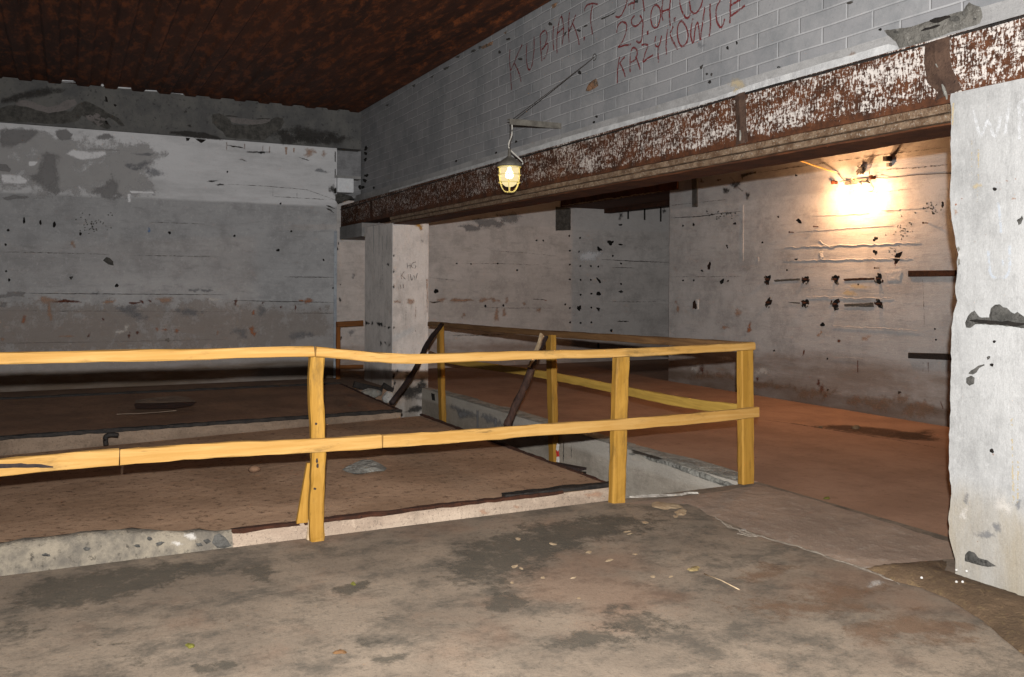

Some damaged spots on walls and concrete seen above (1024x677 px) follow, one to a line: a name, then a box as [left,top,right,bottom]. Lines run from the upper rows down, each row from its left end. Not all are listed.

spalling [884,2,982,48]
leakage [3,89,61,102]
leakage [171,125,220,140]
leakage [0,129,169,200]
spalling [965,304,1024,328]
leakage [449,517,666,612]
spalling [965,551,995,567]
leakage [556,604,672,648]